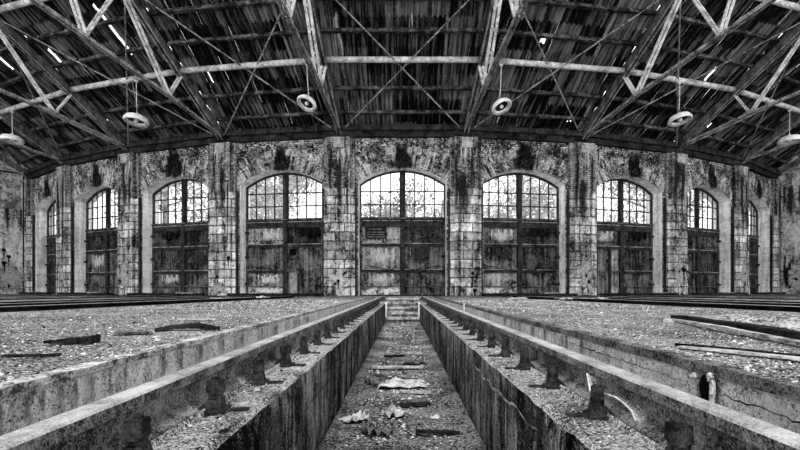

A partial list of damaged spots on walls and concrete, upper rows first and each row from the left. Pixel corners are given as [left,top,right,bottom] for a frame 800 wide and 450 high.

leakage [168,149,181,174]
leakage [274,144,287,170]
leakage [395,142,408,167]
leakage [517,143,534,168]
leakage [628,153,653,177]
hole [690,372,717,403]
crack [724,394,800,423]